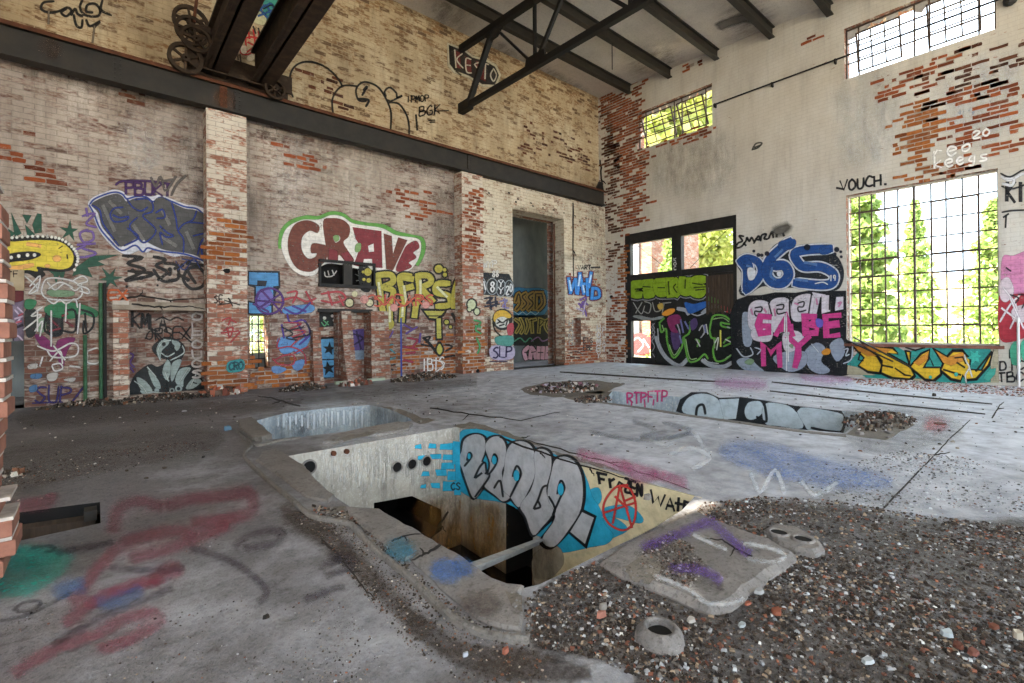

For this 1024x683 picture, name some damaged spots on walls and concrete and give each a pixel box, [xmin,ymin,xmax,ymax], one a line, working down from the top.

peeling [0,143,67,186]
peeling [270,141,327,172]
peeling [870,42,1024,183]
peeling [386,188,494,262]
peeling [517,78,716,365]
crack [880,402,1004,513]